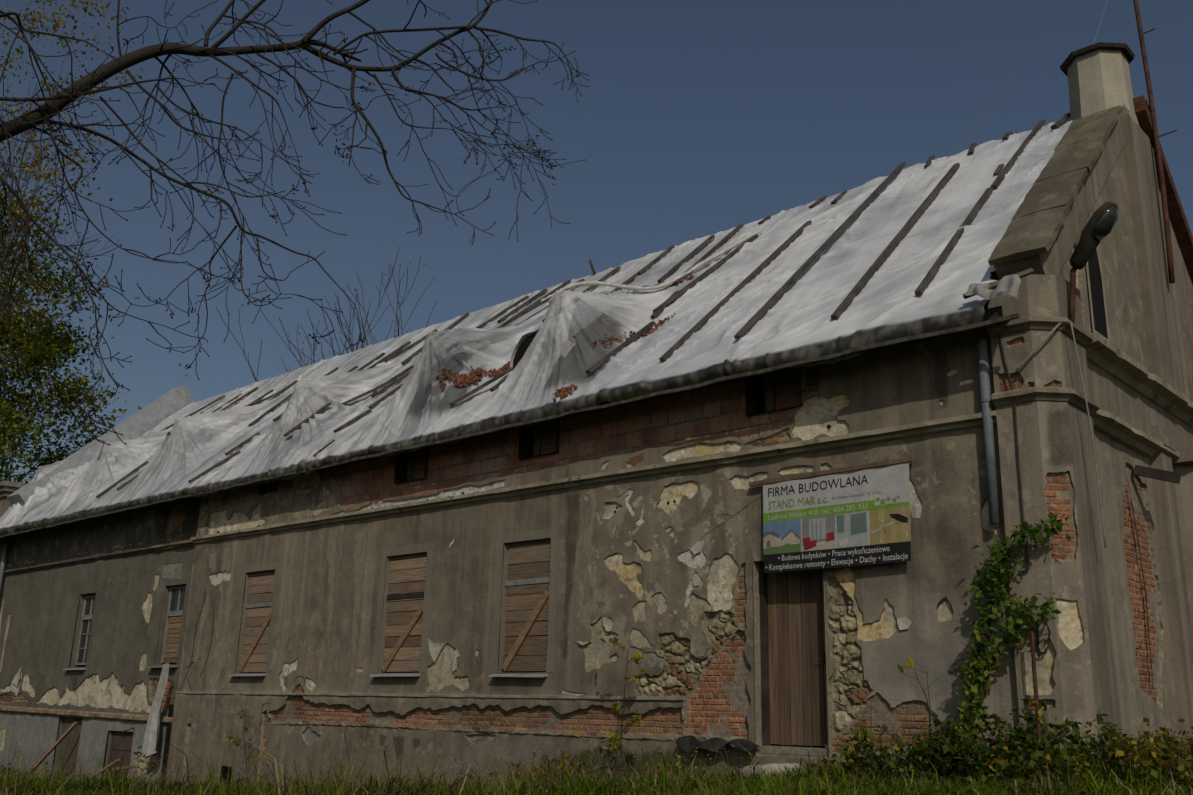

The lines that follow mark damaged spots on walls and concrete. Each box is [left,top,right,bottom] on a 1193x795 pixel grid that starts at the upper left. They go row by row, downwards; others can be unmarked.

flaking render [662,393,850,462]
flaking render [204,489,265,535]
flaking render [602,480,699,538]
flaking render [1045,470,1078,563]
flaking render [0,558,197,713]
flaking render [257,538,751,785]
flaking render [826,567,958,758]
flaking render [1015,598,1084,709]
flaking render [1123,462,1164,709]